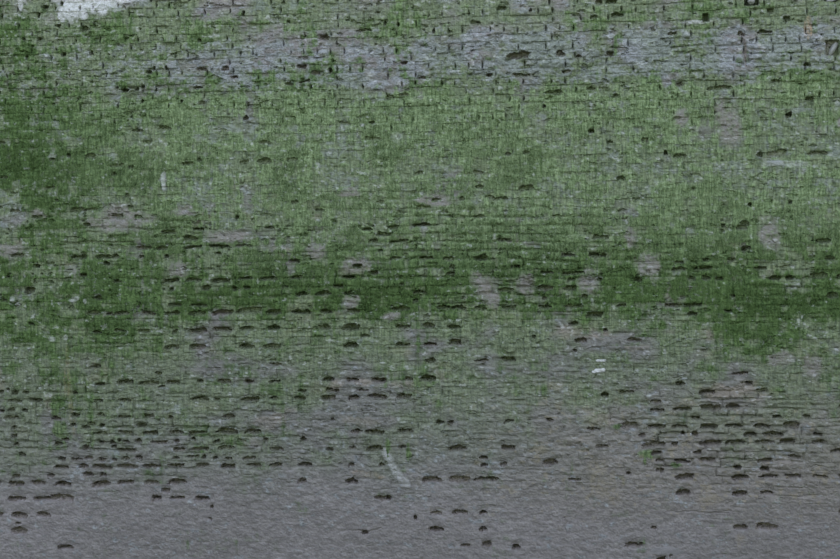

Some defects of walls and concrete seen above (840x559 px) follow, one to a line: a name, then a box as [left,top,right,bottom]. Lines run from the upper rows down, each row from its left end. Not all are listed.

water stain [759,159,811,175]